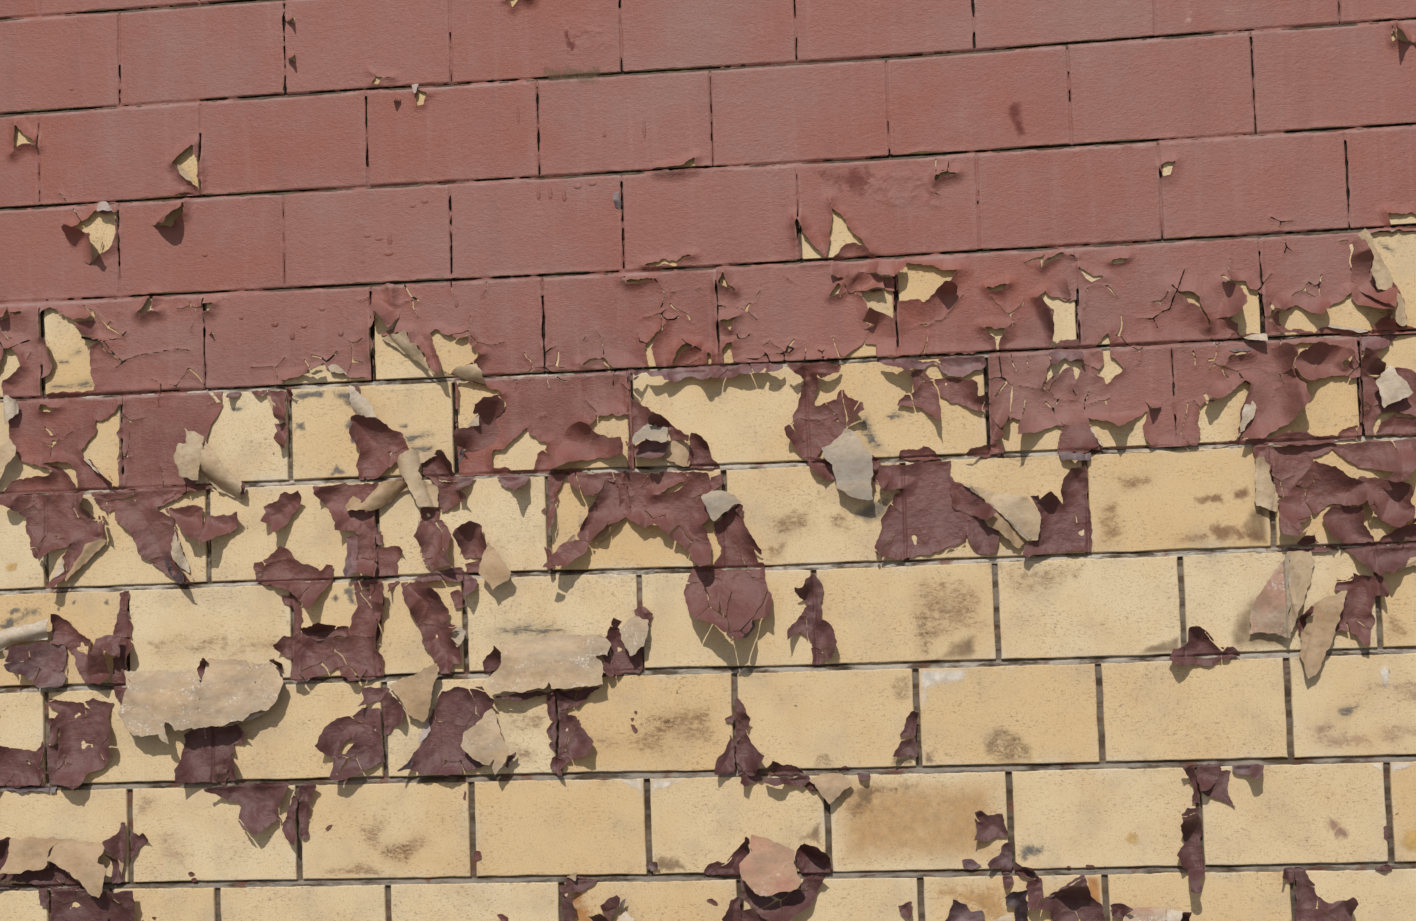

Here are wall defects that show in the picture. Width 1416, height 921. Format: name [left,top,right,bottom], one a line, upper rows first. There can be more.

peeling [0,294,239,589]
peeling [564,242,864,480]
peeling [784,185,1166,560]
peeling [1165,202,1416,645]
peeling [0,592,133,793]
peeling [0,822,148,921]
peeling [174,277,772,845]
peeling [714,698,819,792]
peeling [703,837,832,921]
peeling [787,573,837,665]
peeling [962,810,1133,921]
peeling [1177,763,1264,893]